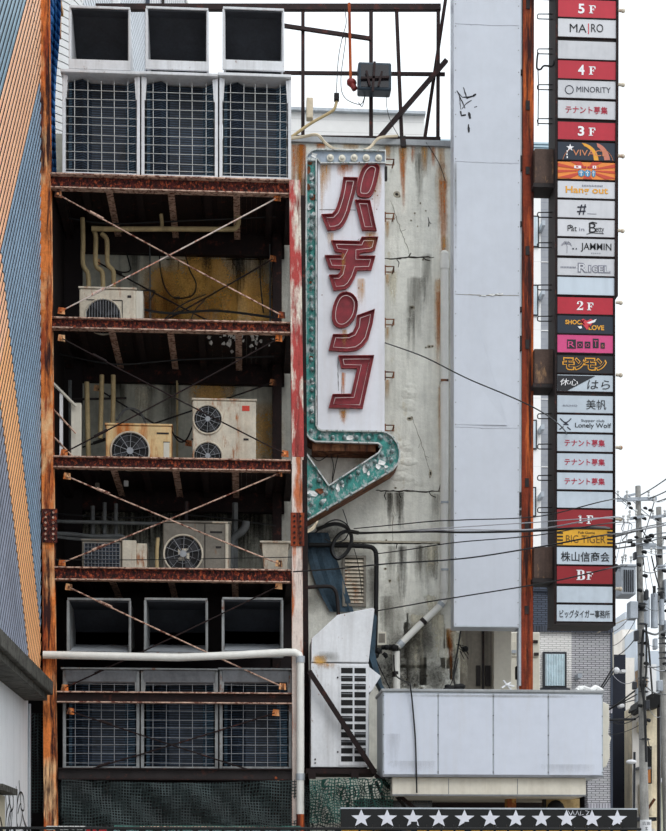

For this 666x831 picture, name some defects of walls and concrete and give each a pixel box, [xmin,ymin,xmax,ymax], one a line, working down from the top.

corrosion [292,144,305,191]
corrosion [424,147,446,216]
leakage [144,257,272,321]
leakage [388,493,402,518]
leakage [399,615,427,687]